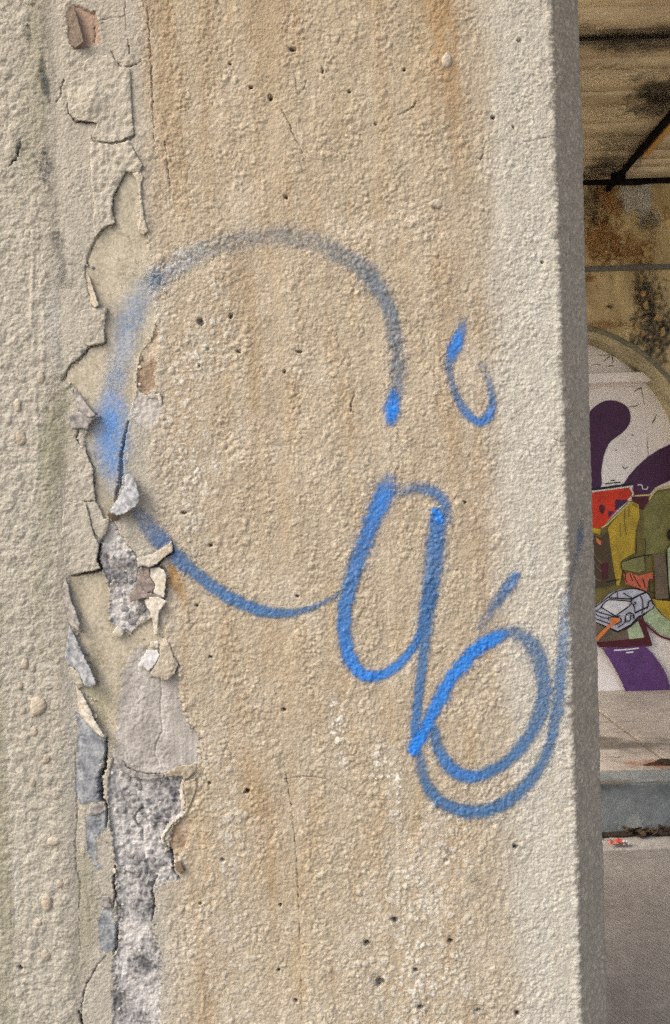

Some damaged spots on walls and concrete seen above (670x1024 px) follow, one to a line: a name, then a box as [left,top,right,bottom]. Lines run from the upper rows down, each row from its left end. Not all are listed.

peeling [66,4,101,50]
peeling [61,172,210,1024]